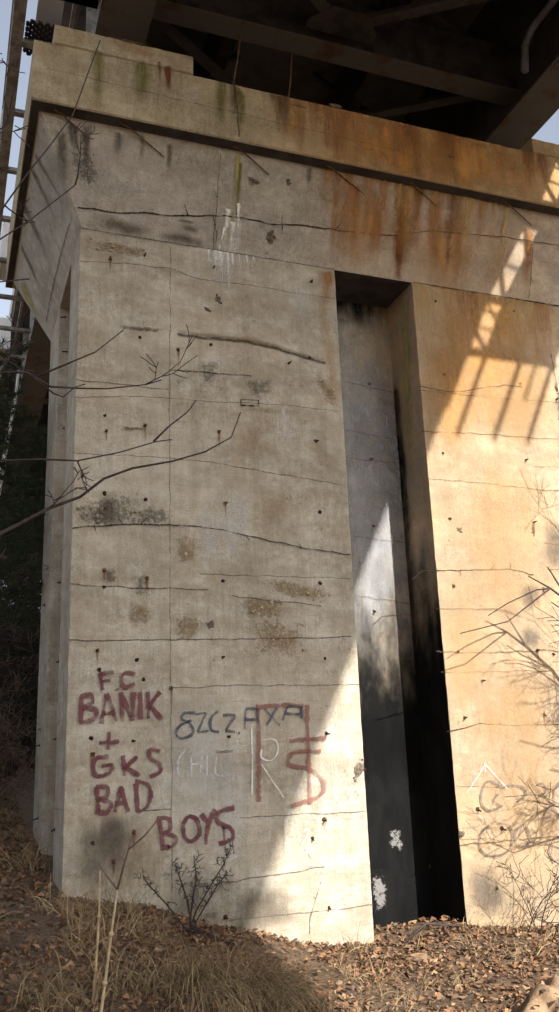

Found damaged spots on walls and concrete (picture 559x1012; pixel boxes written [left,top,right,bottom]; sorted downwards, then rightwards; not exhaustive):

leakage [107,220,141,233]
leakage [168,156,253,279]
crack [46,153,559,320]
corrosion [271,93,553,276]